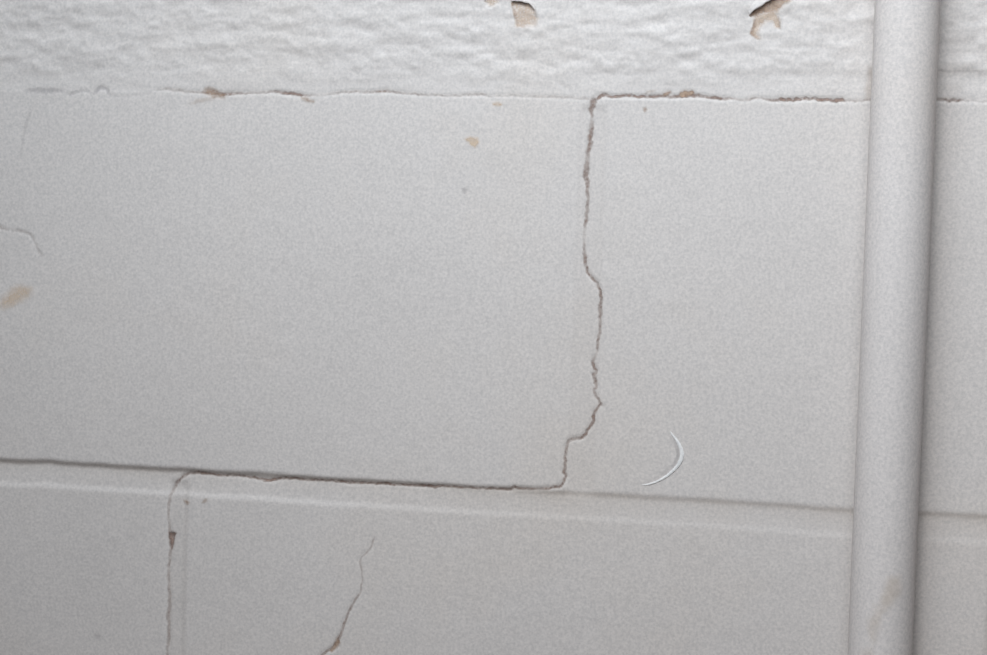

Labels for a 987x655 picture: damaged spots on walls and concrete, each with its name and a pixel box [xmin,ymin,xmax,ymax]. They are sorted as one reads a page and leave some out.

peeling [511,0,536,24]
peeling [748,0,789,36]
crack [773,96,844,104]
crack [584,91,723,222]
crack [179,255,602,490]
crack [168,533,176,547]